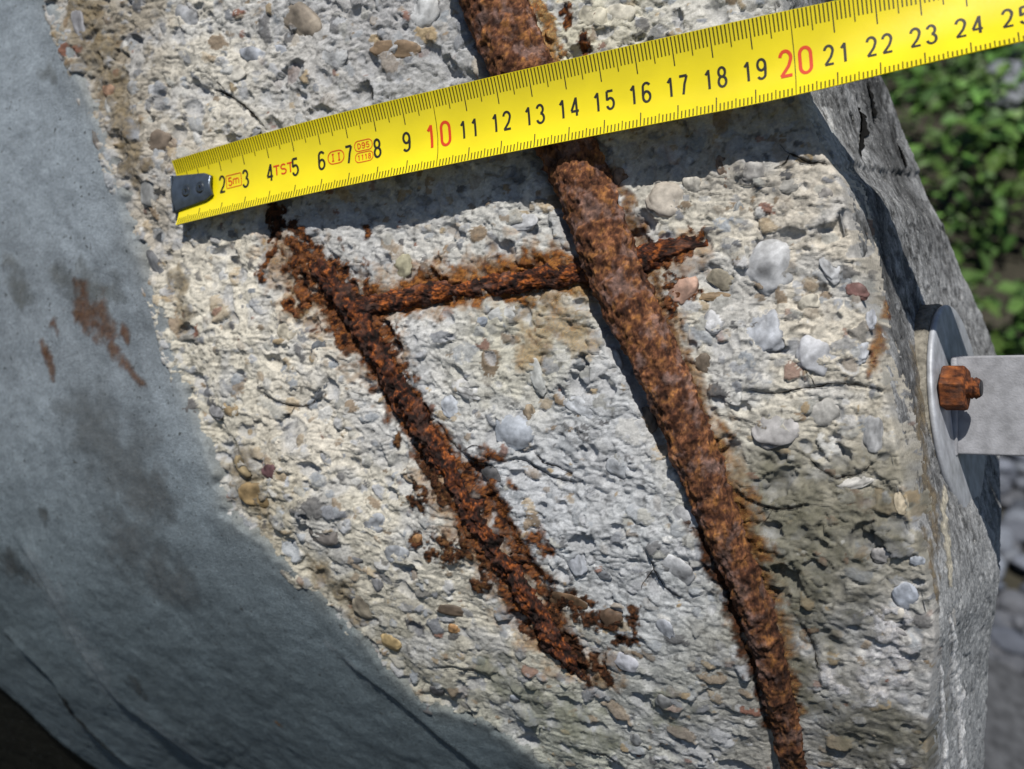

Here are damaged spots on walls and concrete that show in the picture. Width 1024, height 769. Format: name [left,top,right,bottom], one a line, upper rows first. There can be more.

corrosion [528,0,591,62]
crack [776,147,825,167]
crack [858,83,877,157]
corrosion [609,169,649,245]
corrosion [40,340,55,382]
corrosion [74,281,145,385]
spalling [42,0,789,769]
spalling [594,94,956,769]
corrosion [646,226,805,729]